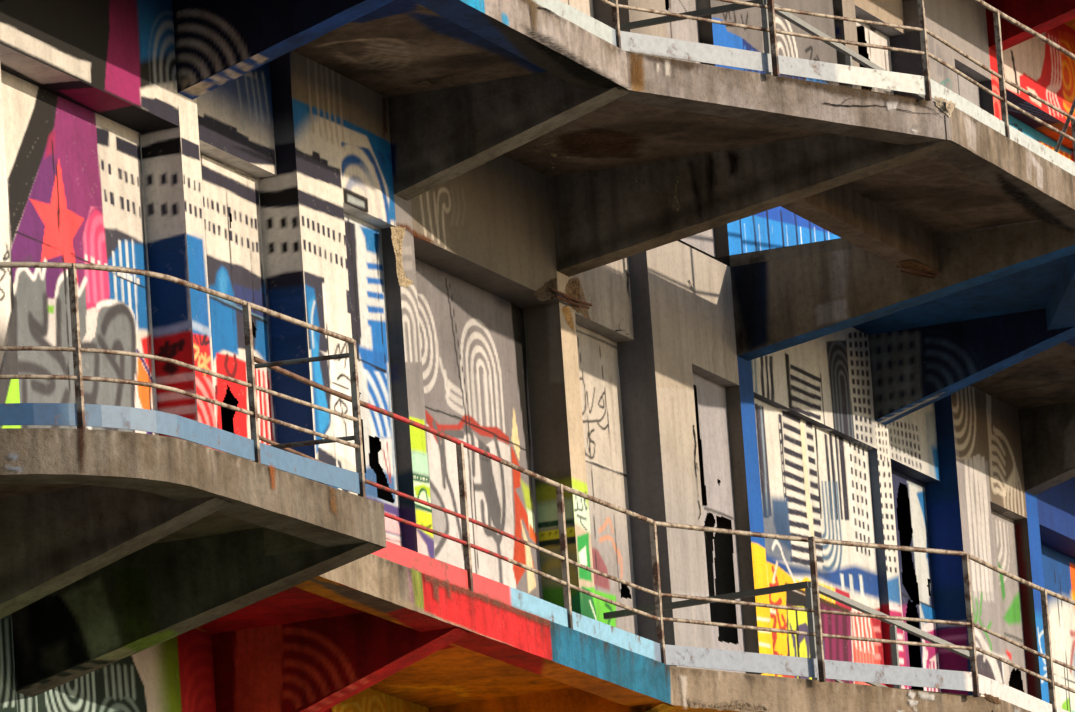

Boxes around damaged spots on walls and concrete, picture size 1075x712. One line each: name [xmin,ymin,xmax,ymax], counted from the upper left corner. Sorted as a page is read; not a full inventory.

spalling [391,226,413,287]
spalling [534,277,592,331]